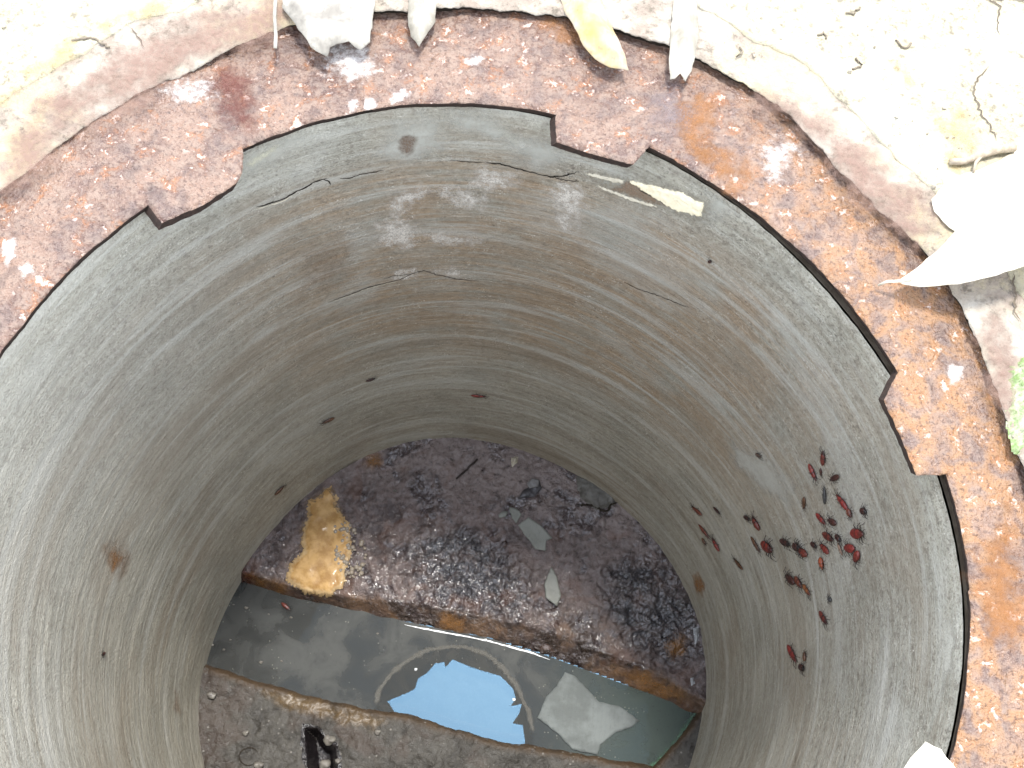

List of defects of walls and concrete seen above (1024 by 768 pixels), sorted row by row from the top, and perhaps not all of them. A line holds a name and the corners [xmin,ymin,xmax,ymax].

corrosion [1,0,288,192]
crack [256,171,378,210]
leakage [375,187,425,249]
leakage [441,169,515,209]
crack [450,160,579,182]
leakage [552,183,583,230]
spalling [586,173,706,218]
corrosion [785,105,926,235]
crack [335,270,470,301]
corrosion [242,485,352,598]
corrosion [272,694,378,725]